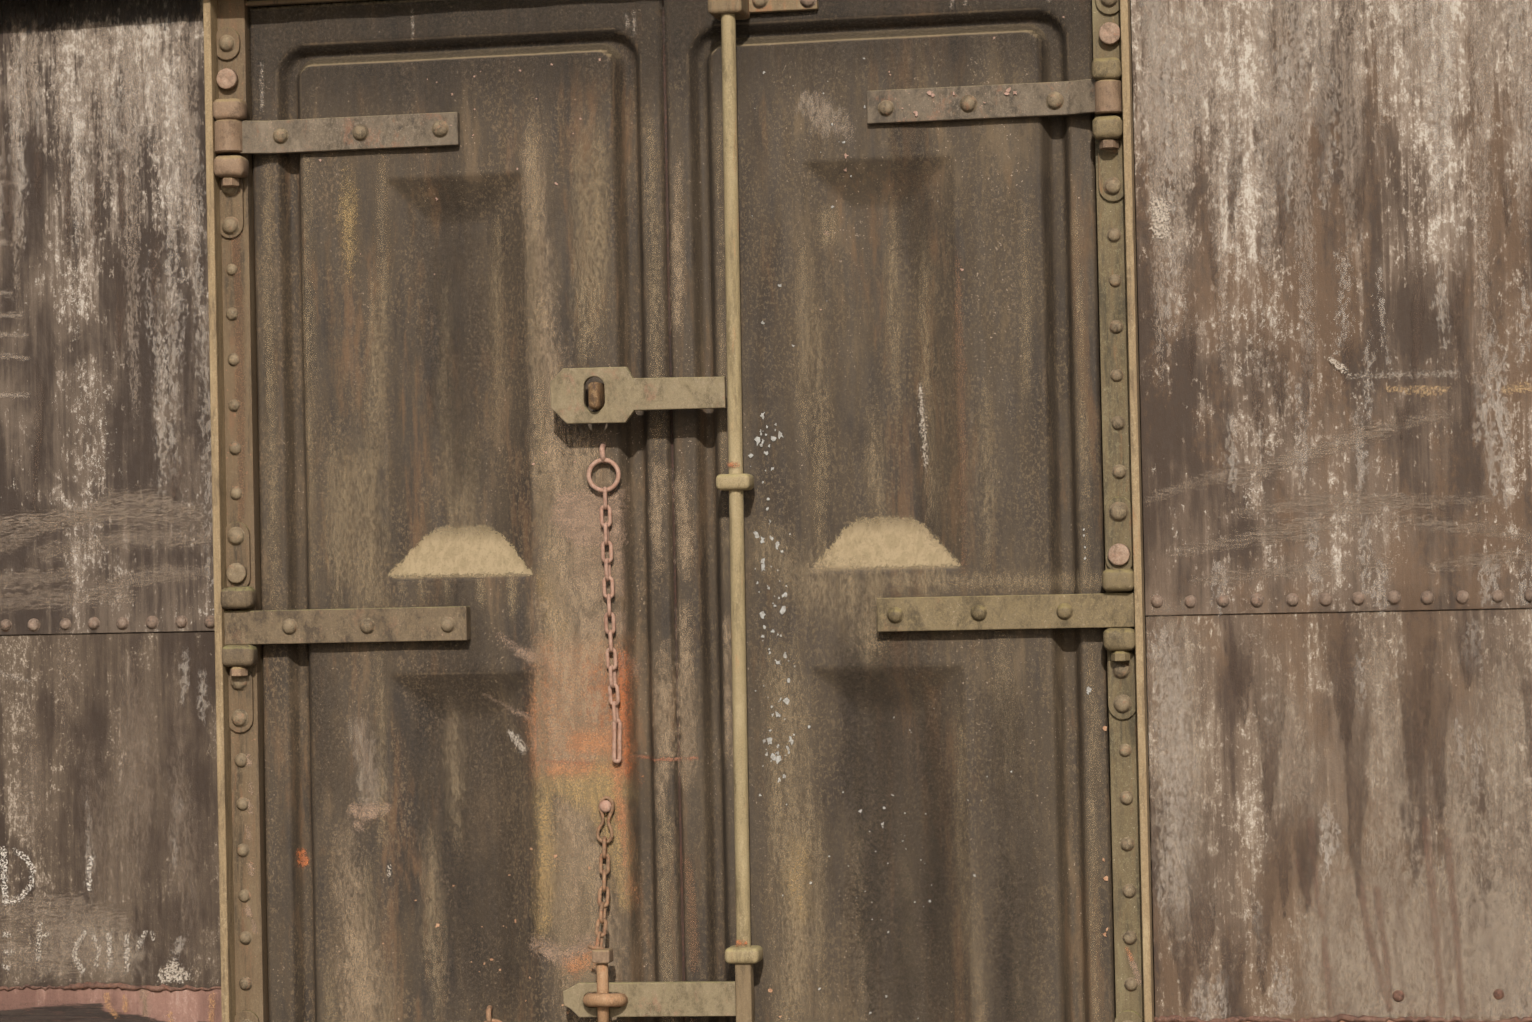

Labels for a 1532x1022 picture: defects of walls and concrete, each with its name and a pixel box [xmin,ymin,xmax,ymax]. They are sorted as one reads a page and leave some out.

peeling [1147,193,1172,241]
corrosion [528,638,698,973]
water stain [1261,736,1281,819]
water stain [1173,912,1271,1008]